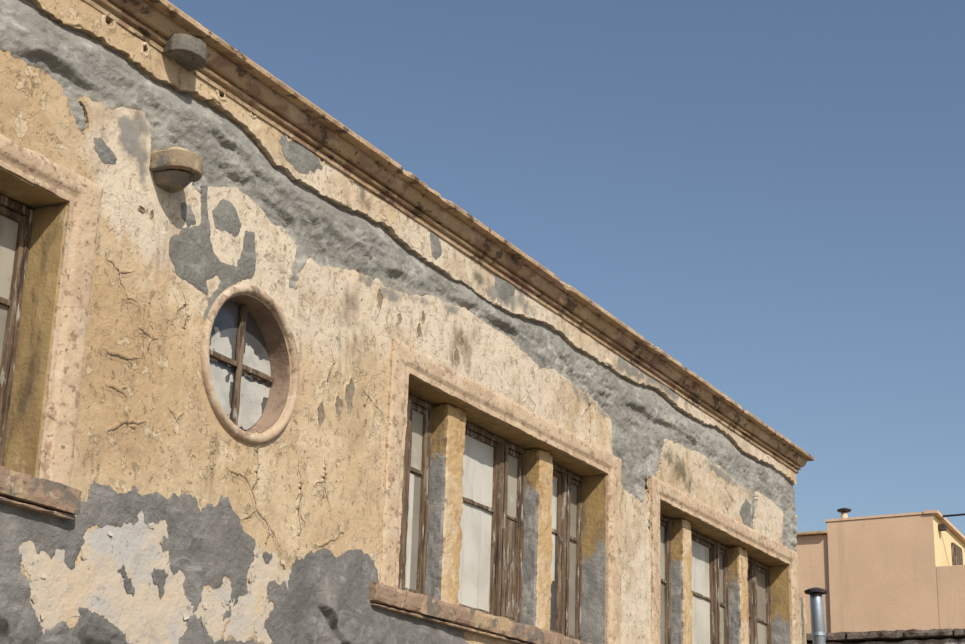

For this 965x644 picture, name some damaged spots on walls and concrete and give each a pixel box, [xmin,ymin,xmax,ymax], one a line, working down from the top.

crack [105,257,185,435]
crack [177,290,191,335]
crack [319,342,336,401]
flaking render [0,0,798,552]
crack [207,431,344,554]
peeling [19,511,291,644]